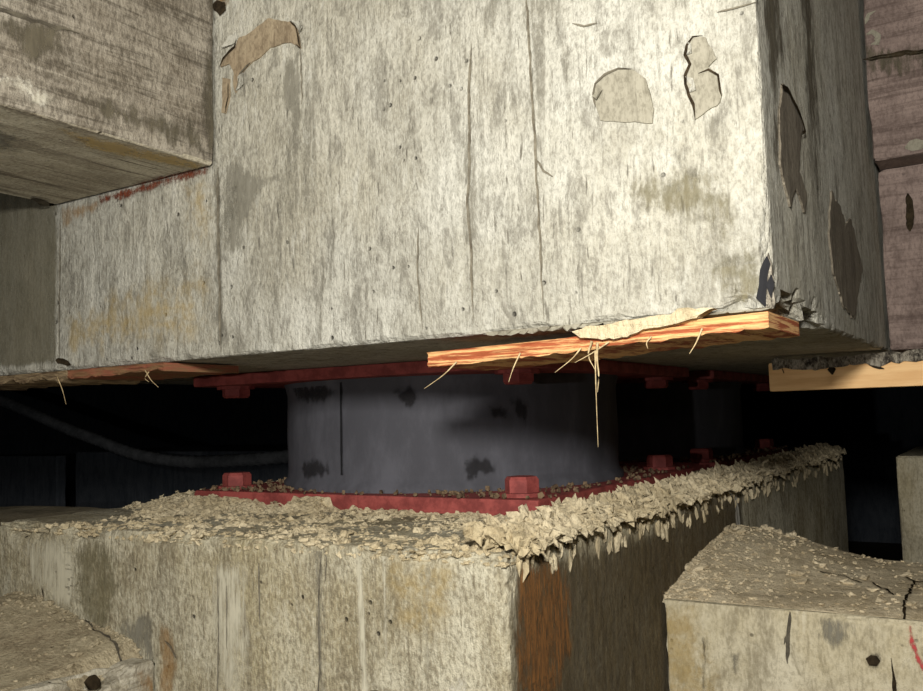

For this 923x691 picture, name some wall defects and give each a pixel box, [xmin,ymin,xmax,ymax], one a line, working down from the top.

peeling [219,18,302,114]
peeling [592,67,654,124]
peeling [683,35,722,119]
rust [99,167,206,203]
crack [466,49,474,317]
crack [526,0,553,316]
crack [317,549,327,691]
crack [783,612,791,664]
crack [820,571,923,619]
crack [890,659,898,691]